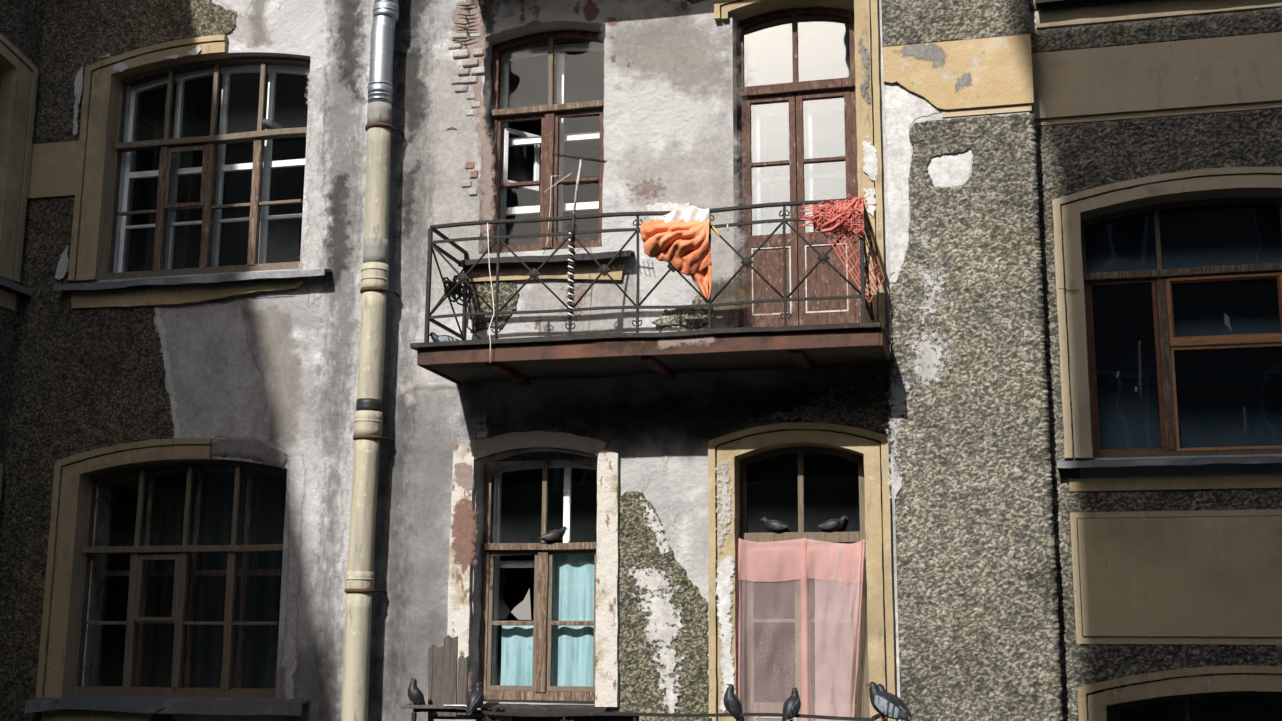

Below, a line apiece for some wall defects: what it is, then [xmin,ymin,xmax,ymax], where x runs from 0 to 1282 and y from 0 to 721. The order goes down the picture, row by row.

flaking render [215,0,269,51]
damp [331,0,364,98]
damp [398,0,428,142]
peeling [300,62,330,308]
damp [327,175,352,282]
damp [398,165,419,235]
peeling [402,0,495,295]
flaking render [858,37,946,287]
flaking render [928,150,973,188]
flaking render [153,300,306,700]
flaking render [451,462,478,573]
peeling [628,496,687,713]